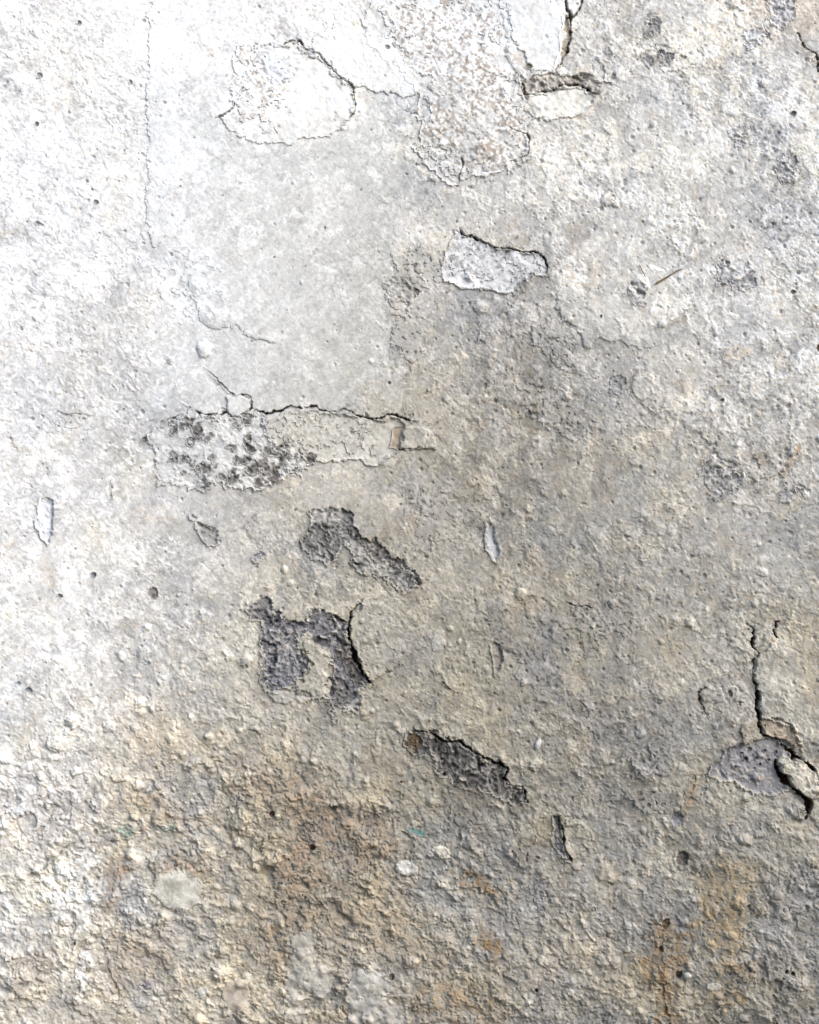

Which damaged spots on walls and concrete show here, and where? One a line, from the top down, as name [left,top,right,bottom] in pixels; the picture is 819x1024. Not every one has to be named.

peeling [219,0,603,186]
peeling [441,223,554,295]
peeling [141,394,437,493]
spalling [300,505,423,595]
spalling [245,595,416,724]
spalling [399,725,529,807]
flaking render [699,642,819,829]
crack [738,620,817,820]
flaking render [551,814,595,863]